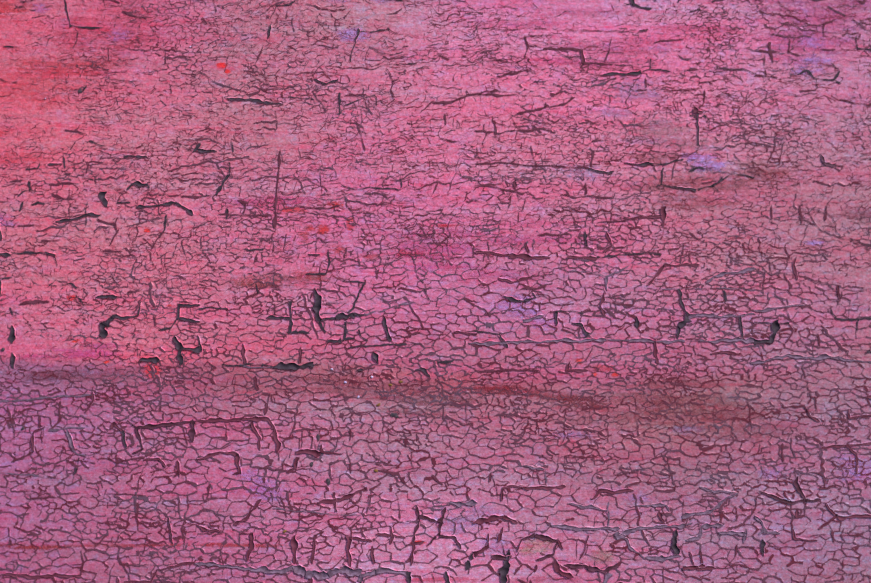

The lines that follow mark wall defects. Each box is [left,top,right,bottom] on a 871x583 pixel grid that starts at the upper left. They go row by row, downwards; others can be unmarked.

crack [112,0,147,19]
crack [0,129,271,368]
crack [227,0,871,420]
crack [0,252,871,583]